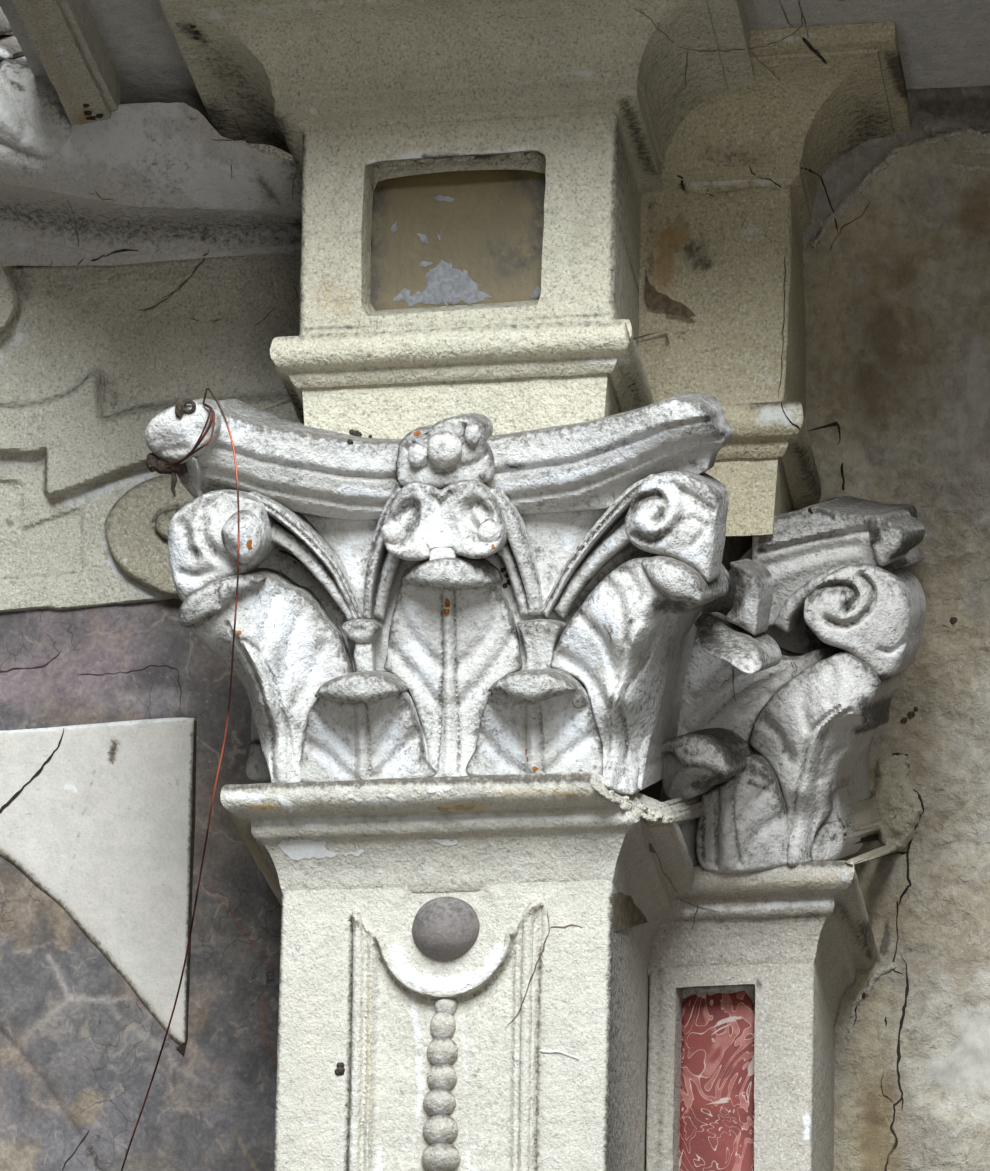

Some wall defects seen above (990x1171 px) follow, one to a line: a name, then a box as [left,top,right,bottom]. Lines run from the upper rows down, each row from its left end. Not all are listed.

crack [676,175,728,197]
crack [749,166,870,251]
crack [138,250,209,312]
peeling [393,259,493,308]
crack [778,255,845,514]
crack [0,651,182,703]
crack [0,728,64,813]
crack [506,912,582,1028]
crack [845,789,924,1171]